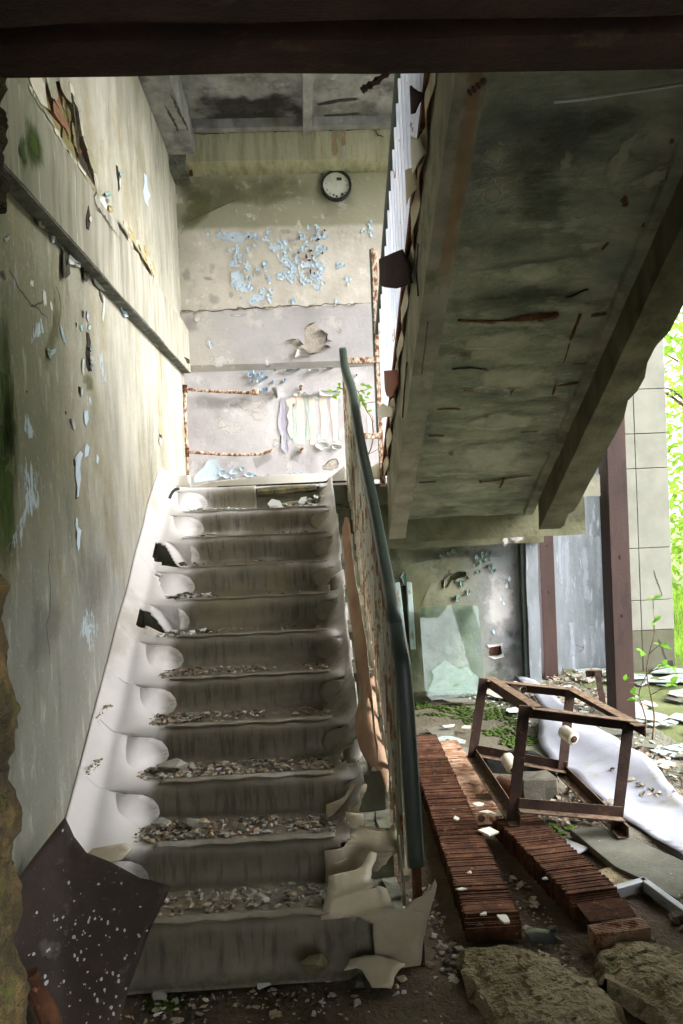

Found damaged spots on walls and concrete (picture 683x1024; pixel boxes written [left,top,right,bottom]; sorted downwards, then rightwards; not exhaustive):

leakage [201,94,302,119]
flaking render [28,77,158,284]
peeling [205,224,351,306]
crack [0,270,61,324]
corrosion [459,312,558,324]
flaking render [248,322,341,454]
peeling [65,411,89,430]
peeling [73,443,99,499]
peeling [440,549,496,601]